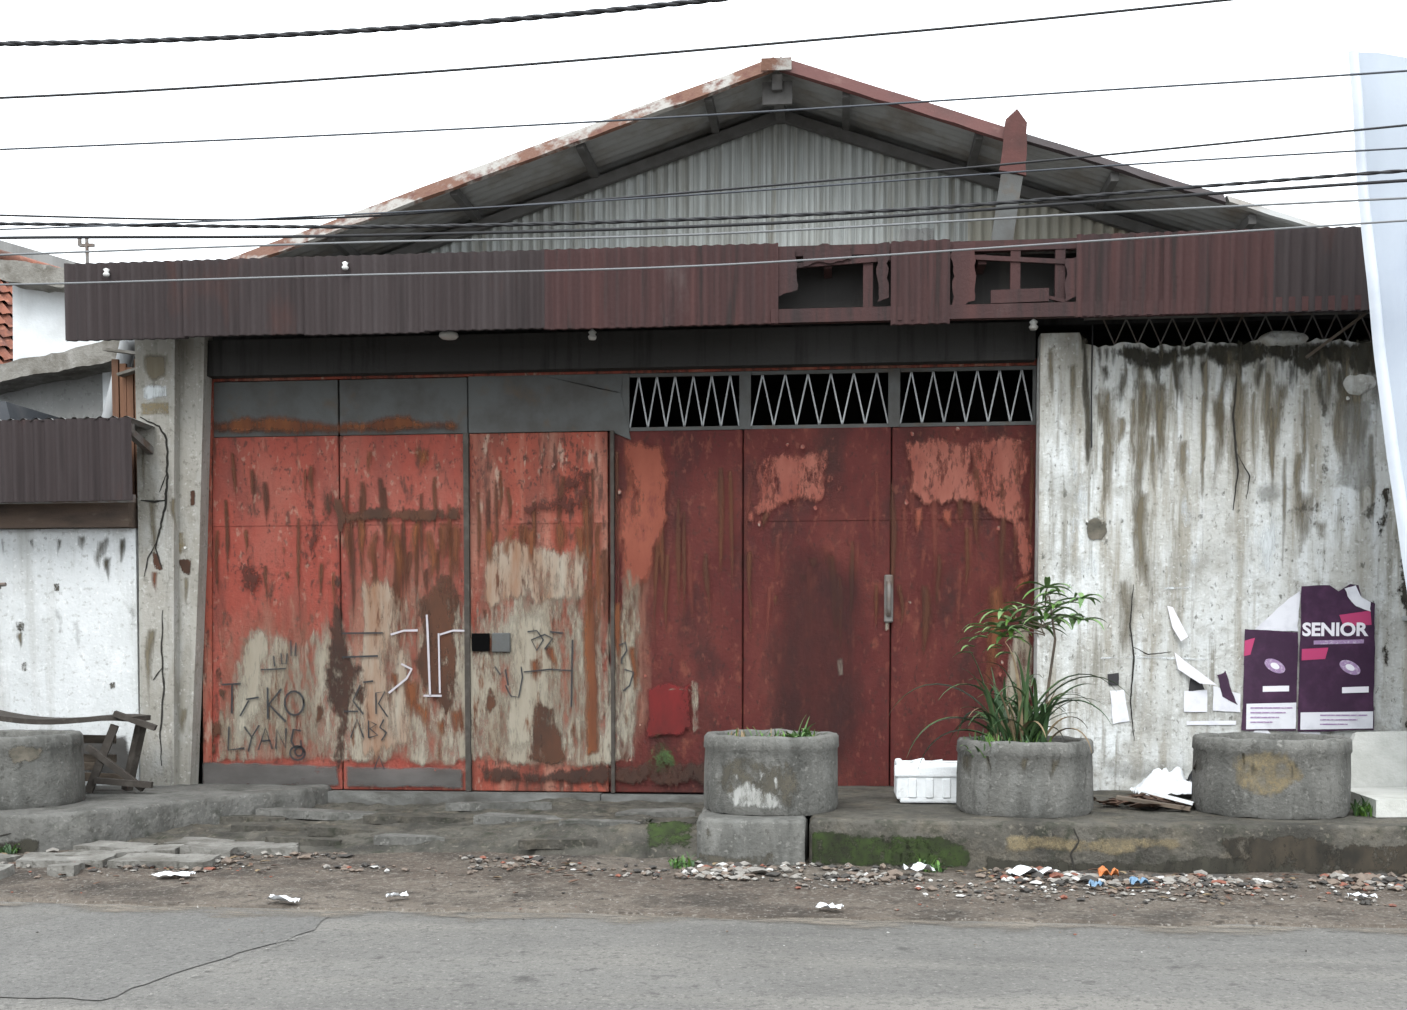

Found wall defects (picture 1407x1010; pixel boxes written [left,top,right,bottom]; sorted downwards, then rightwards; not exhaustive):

rust [215,453,269,594]
rust [214,416,457,434]
peeling [748,443,840,526]
damp [1071,338,1389,580]
rust [153,552,162,586]
rust [179,559,191,597]
rust [283,465,462,768]
peeling [217,523,646,771]
rust [486,465,601,764]
damp [1120,583,1130,644]
damp [1395,559,1407,616]
rust [212,721,221,753]